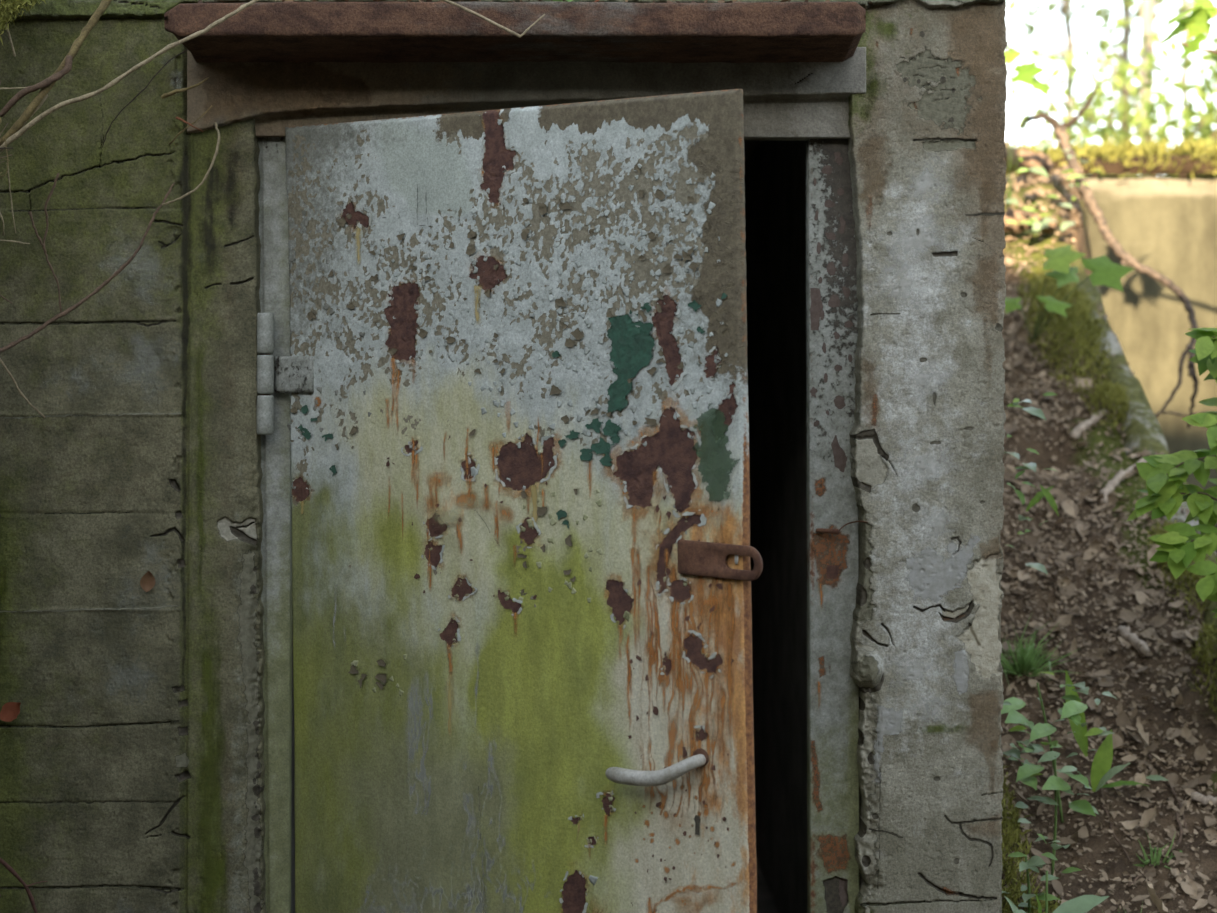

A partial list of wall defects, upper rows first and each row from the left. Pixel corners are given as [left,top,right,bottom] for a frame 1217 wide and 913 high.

crack [0,104,183,248]
leakage [179,151,236,414]
peeling [287,164,727,467]
peeling [690,376,740,510]
rust [605,295,738,913]
spalling [217,517,266,913]
crack [0,796,190,839]
rust [559,870,588,913]
rust [568,790,616,848]
spalling [854,690,880,913]
crack [860,784,992,906]
crack [944,792,1002,867]